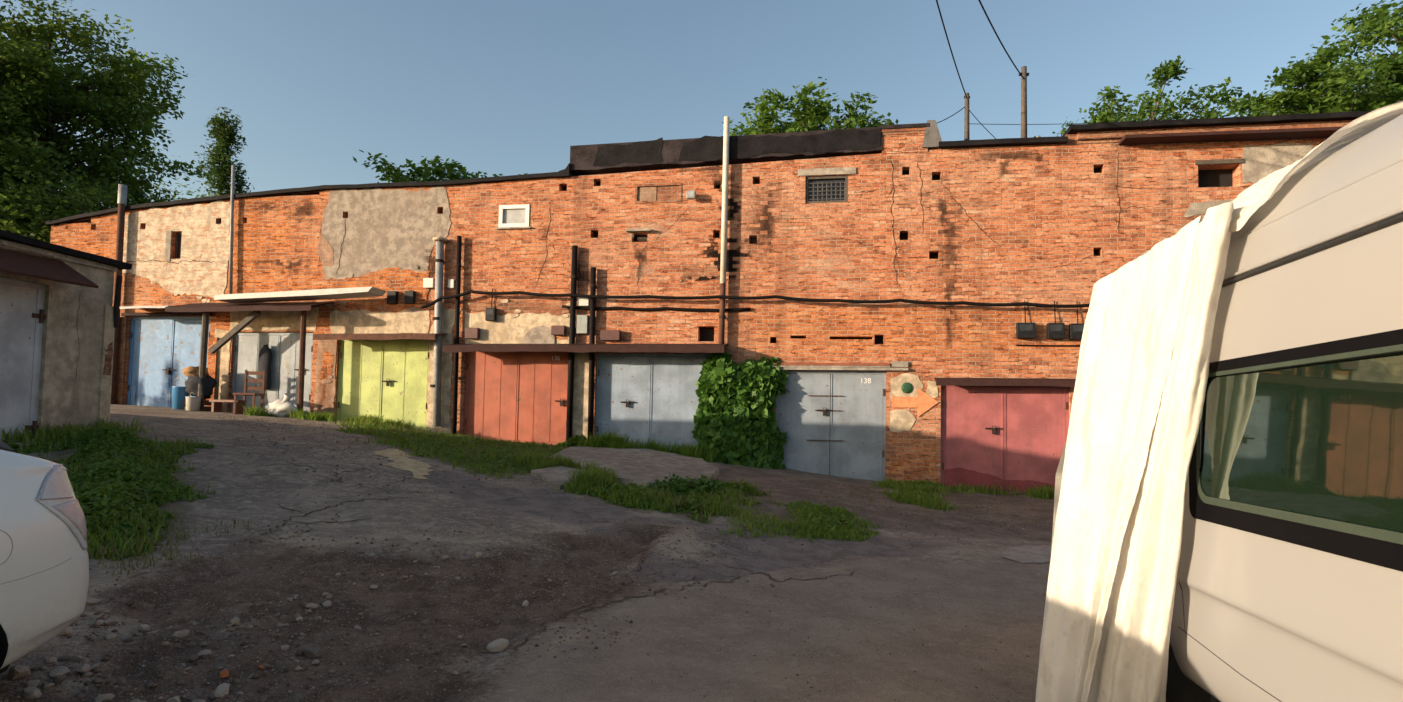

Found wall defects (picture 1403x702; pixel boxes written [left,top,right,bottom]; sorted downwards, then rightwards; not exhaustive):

water stain [689,175,749,281]
water stain [758,207,773,244]
crack [855,158,1001,286]
water stain [940,202,957,262]
spalling [325,265,429,312]